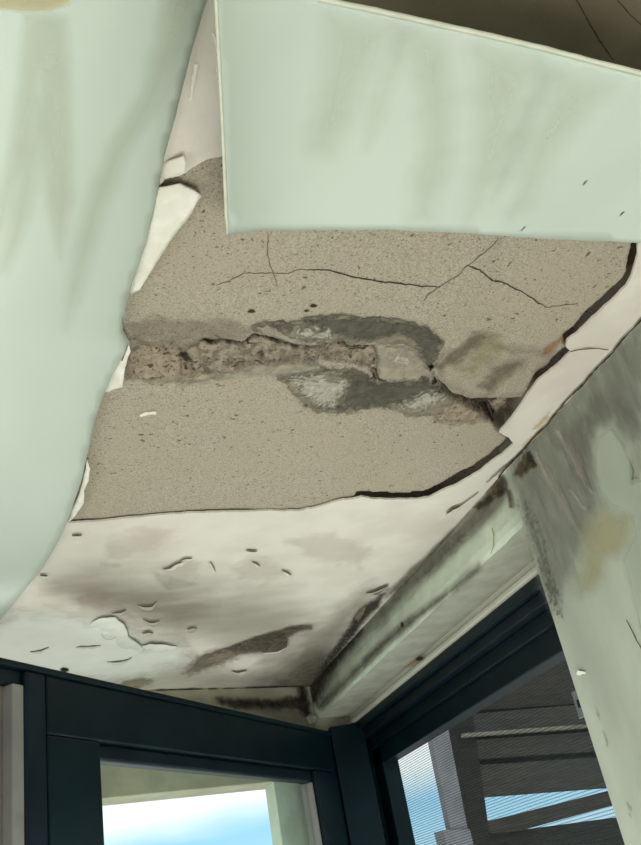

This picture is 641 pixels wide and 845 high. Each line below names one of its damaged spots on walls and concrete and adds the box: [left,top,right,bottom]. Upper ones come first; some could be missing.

crack [217,240,578,308]
spalling [0,0,641,624]
water stain [257,316,495,369]
water stain [217,342,639,722]
peeling [90,601,177,666]
peeling [187,625,312,674]